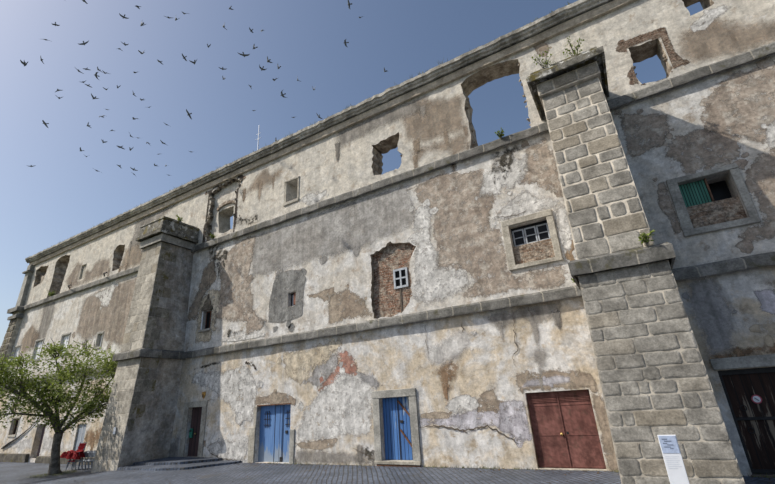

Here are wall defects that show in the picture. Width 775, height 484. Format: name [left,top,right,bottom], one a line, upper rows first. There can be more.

spalling [616,27,690,81]
peeling [690,5,727,32]
peeling [614,57,775,254]
peeling [187,139,577,343]
peeling [191,338,379,450]
peeling [419,368,618,471]